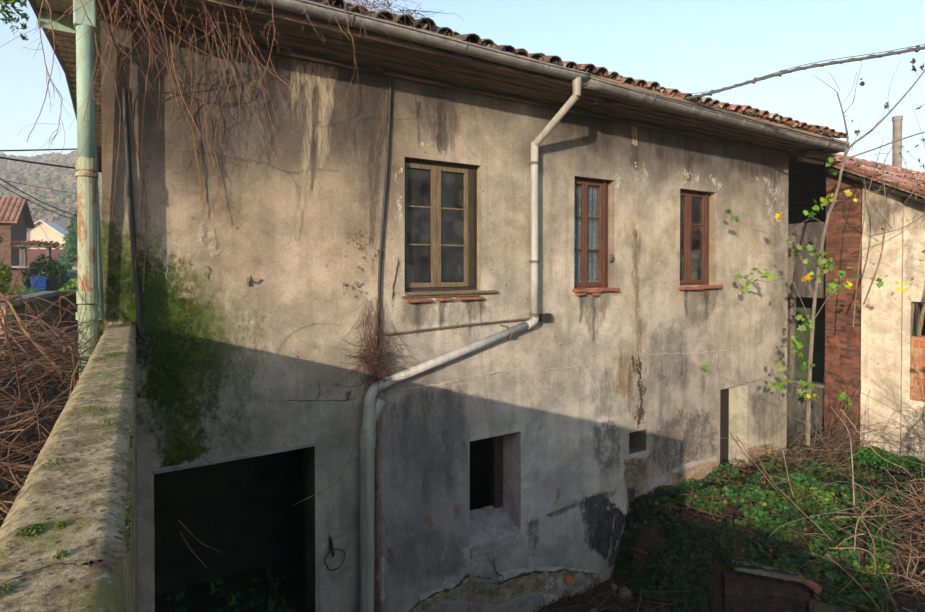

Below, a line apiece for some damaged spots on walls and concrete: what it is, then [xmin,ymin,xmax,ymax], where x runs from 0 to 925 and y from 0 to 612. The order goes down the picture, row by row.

damp [291,60,334,239]
crack [382,364,592,392]
crack [631,336,777,430]
flaking render [624,456,720,514]
damp [580,492,629,568]
flaking render [409,544,601,612]